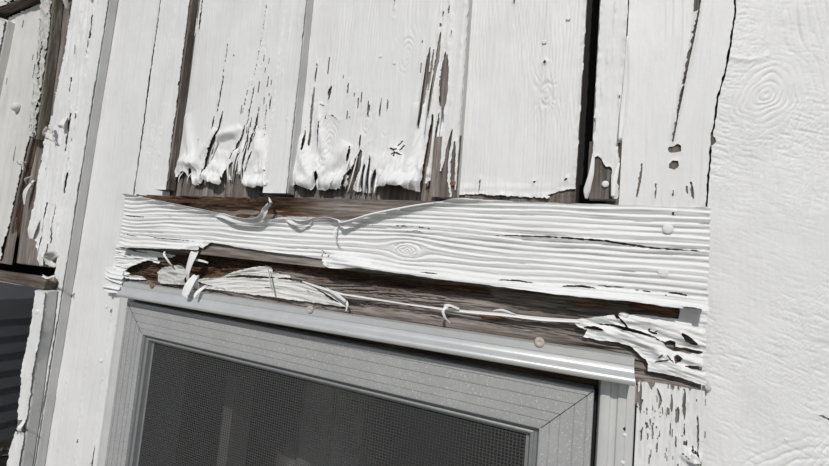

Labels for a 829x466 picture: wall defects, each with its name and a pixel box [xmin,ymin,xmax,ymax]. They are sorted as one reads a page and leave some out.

peeling [27,0,98,265]
peeling [123,0,630,247]
peeling [664,139,686,173]
peeling [710,132,722,148]
peeling [0,217,17,265]
peeling [102,236,711,394]
peeling [14,410,28,439]
crack [810,408,829,425]